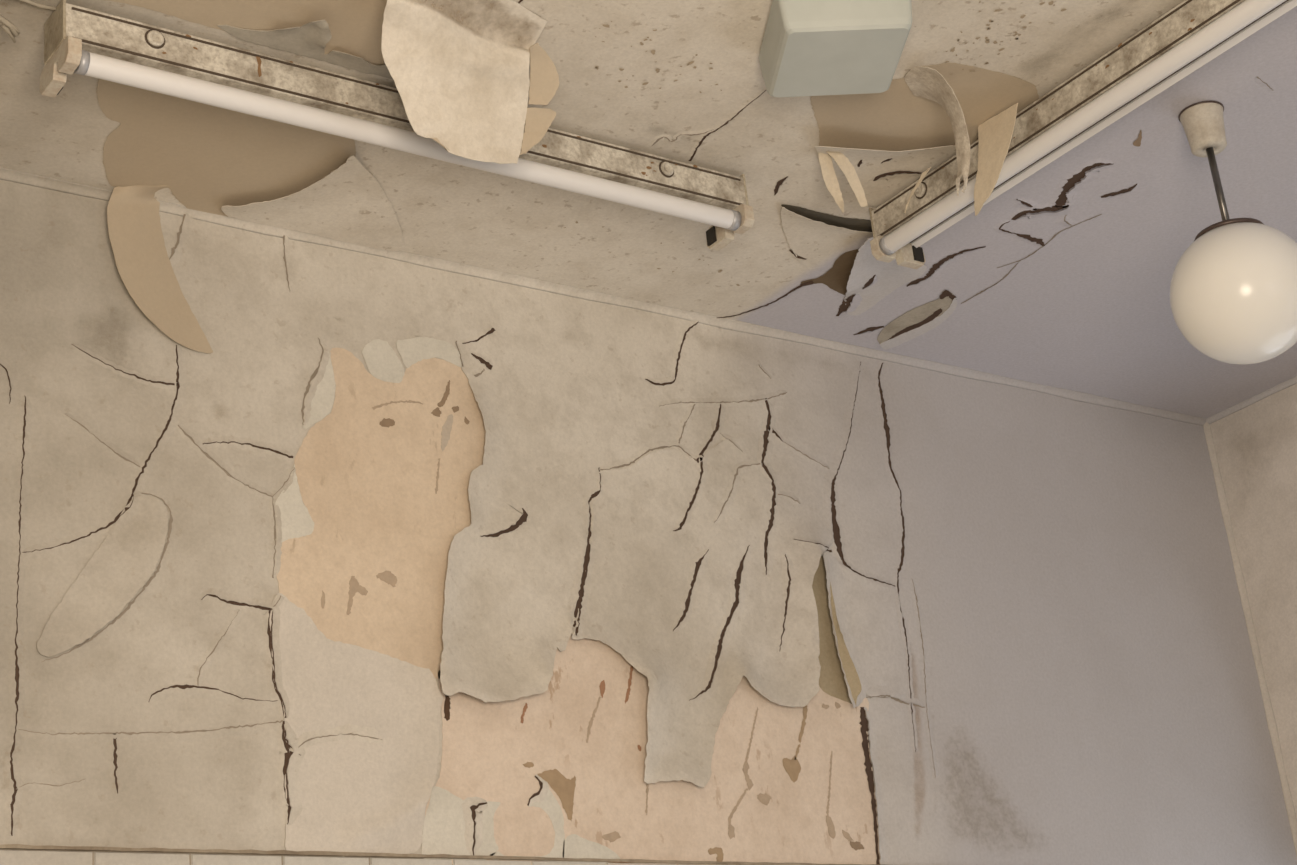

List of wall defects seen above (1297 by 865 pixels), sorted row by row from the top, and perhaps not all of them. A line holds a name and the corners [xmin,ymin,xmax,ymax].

peeling [96,79,404,354]
peeling [217,0,559,164]
peeling [780,63,1039,316]
peeling [877,290,956,344]
crack [0,338,383,836]
flaking render [269,337,907,865]
crack [567,158,1139,865]